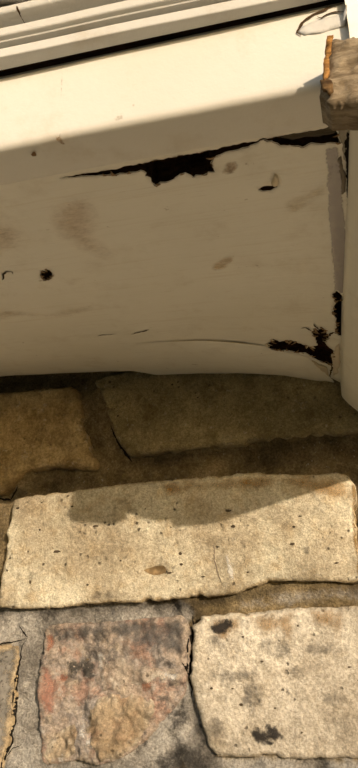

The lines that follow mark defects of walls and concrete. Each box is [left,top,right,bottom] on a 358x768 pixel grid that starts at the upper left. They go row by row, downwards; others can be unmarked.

peeling [296,1,347,96]
spalling [103,142,247,186]
peeling [274,130,349,194]
spalling [265,292,343,366]
crack [0,625,28,768]